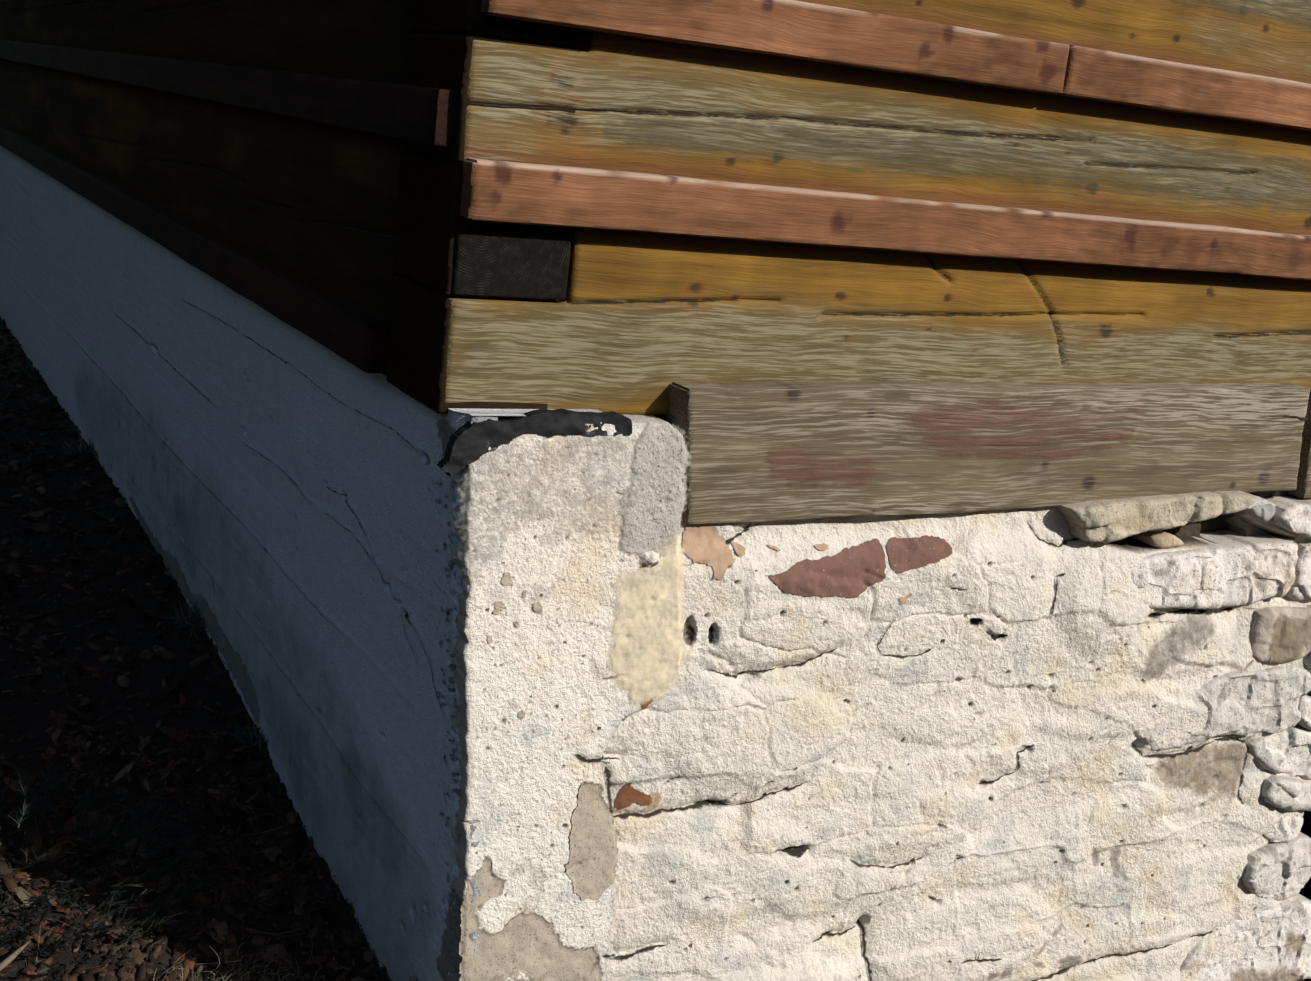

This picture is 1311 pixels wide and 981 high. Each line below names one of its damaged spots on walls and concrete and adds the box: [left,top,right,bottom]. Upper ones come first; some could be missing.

peeling [435,421,746,580]
peeling [493,572,543,615]
spalling [756,535,953,598]
spalling [437,638,461,796]
crack [576,754,810,819]
crack [978,744,1034,784]
peeling [565,782,621,901]
crack [775,846,810,858]
peeling [436,859,603,981]
crack [604,944,668,960]
crack [814,920,872,981]
crack [1031,930,1213,981]